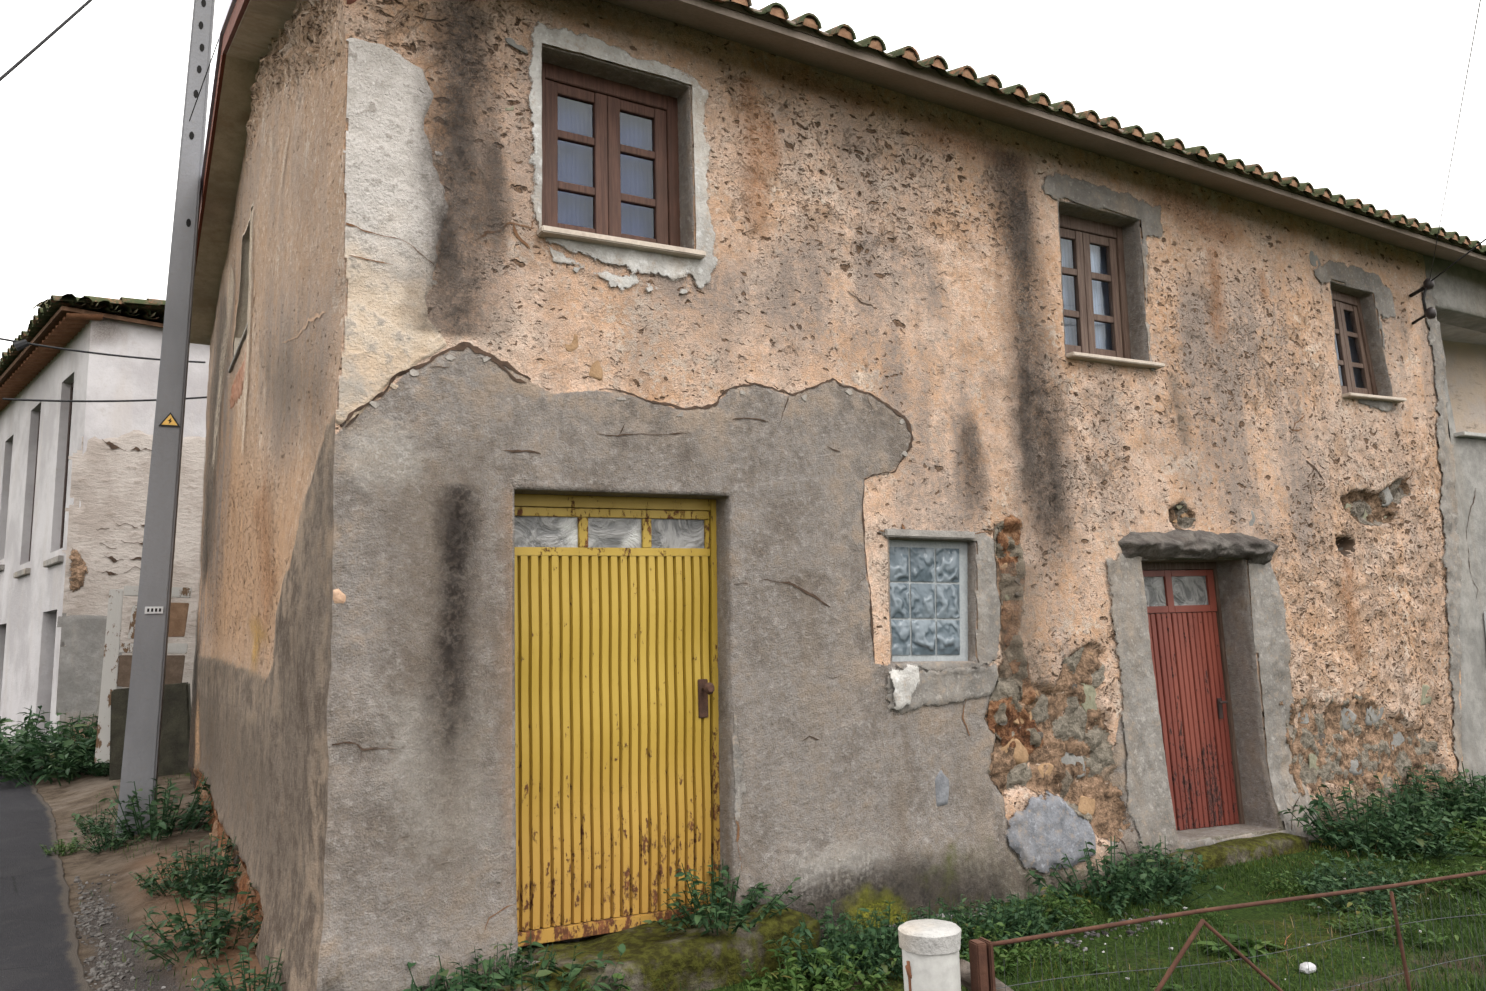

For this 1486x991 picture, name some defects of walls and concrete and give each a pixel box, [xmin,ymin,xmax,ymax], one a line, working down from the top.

flaking render [62,430,153,655]
flaking render [167,436,206,703]
damp [438,484,472,744]
damp [425,1,506,334]
flaking render [550,247,658,292]
flaking render [889,664,920,710]
damp [963,417,982,494]
damp [996,152,1067,552]
spalling [985,515,1134,842]
spalling [1335,477,1411,556]
spalling [190,767,264,949]